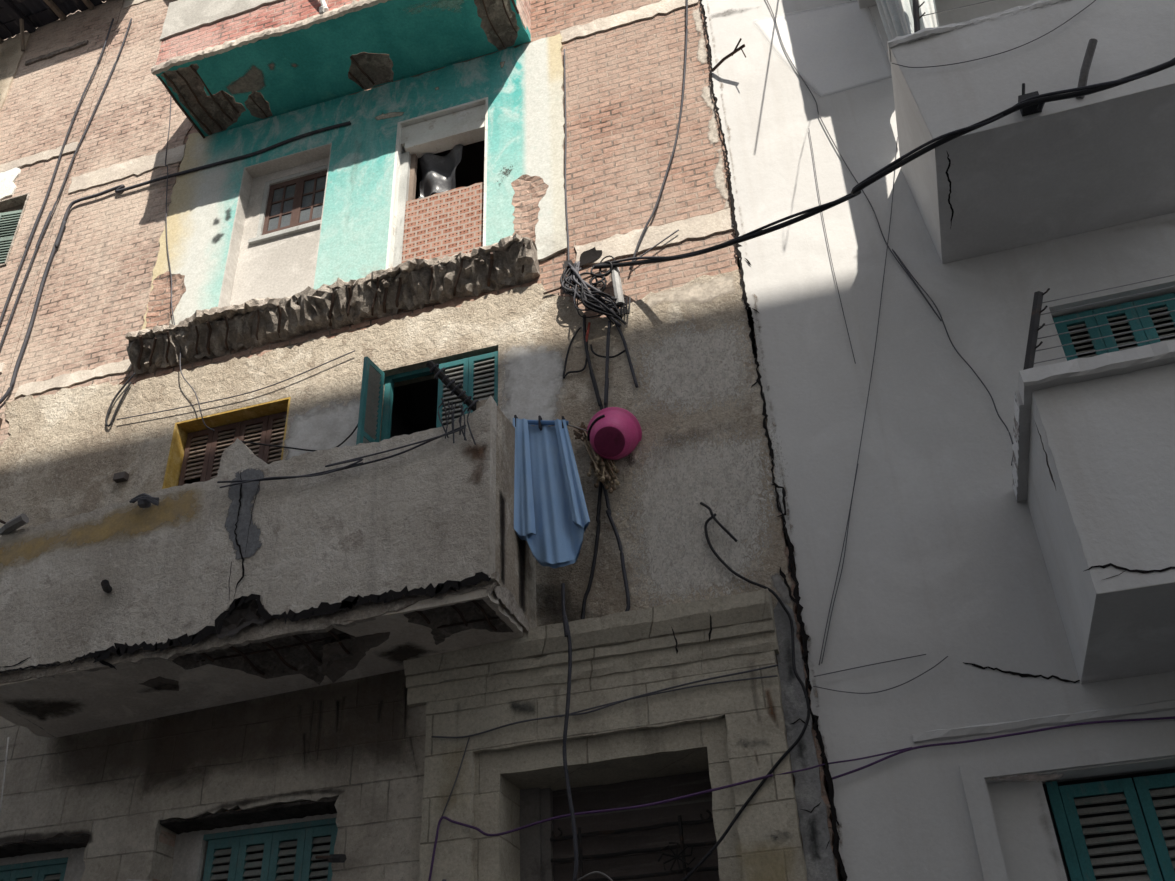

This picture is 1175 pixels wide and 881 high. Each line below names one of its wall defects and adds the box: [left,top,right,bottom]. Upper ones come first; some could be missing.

spalling [158,63,274,139]
spalling [348,52,394,90]
flaking render [511,174,549,248]
crack [945,152,954,229]
flaking render [137,271,186,370]
crack [700,0,848,881]
crack [1034,420,1056,489]
water stain [0,491,196,567]
crack [0,471,260,673]
crack [1084,563,1175,580]
spalling [0,571,531,691]
crack [963,662,1080,683]